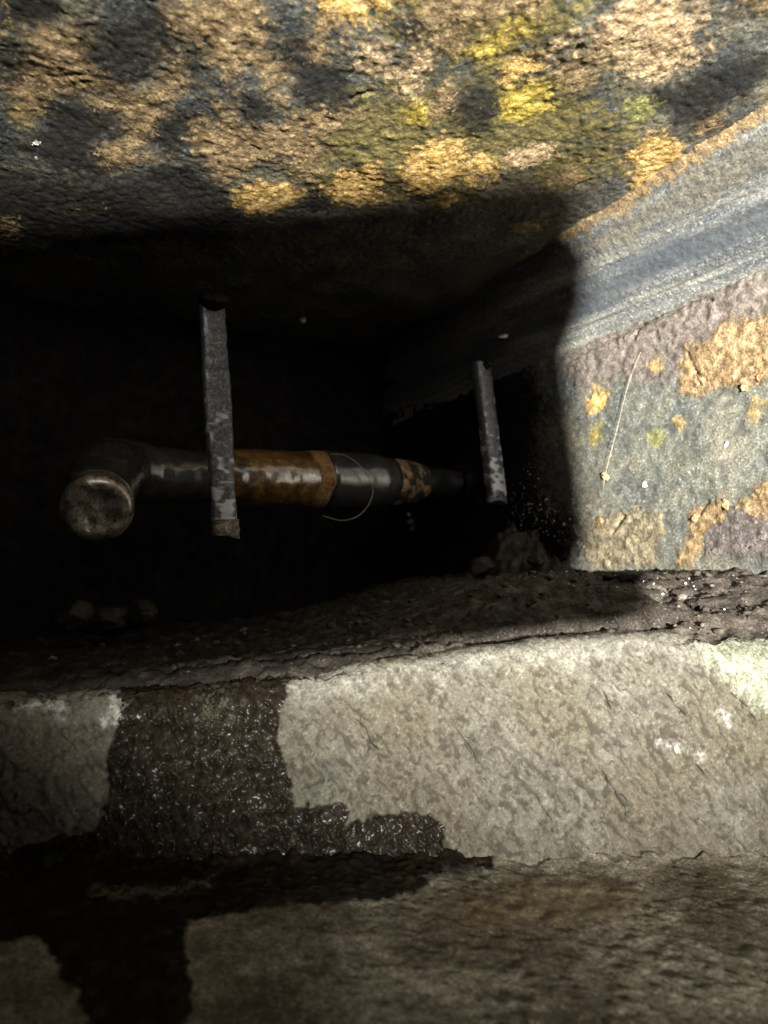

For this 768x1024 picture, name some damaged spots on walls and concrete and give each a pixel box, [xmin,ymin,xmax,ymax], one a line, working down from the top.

leakage [471,171,602,238]
leakage [591,136,768,251]
leakage [0,631,768,1024]